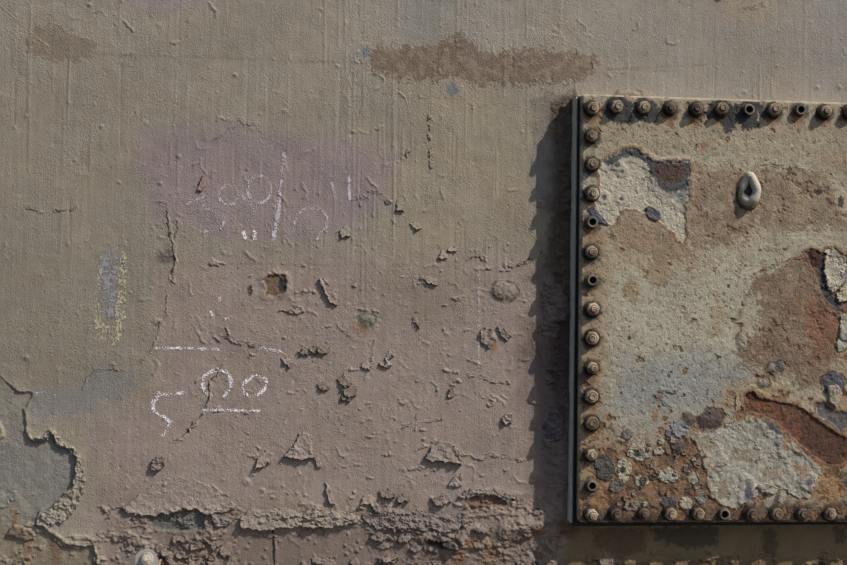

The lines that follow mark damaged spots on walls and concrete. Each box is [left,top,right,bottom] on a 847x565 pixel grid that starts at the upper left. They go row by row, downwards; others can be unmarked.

peeling [587,143,697,244]
crack [80,199,182,391]
peeling [242,267,305,315]
peeling [319,276,340,306]
rust [582,137,847,460]
peeling [797,240,847,352]
peeling [0,374,101,565]
peeling [254,431,322,470]
peeling [121,441,522,565]
rust [439,509,554,565]
rust [579,402,745,521]
peeling [698,392,814,507]